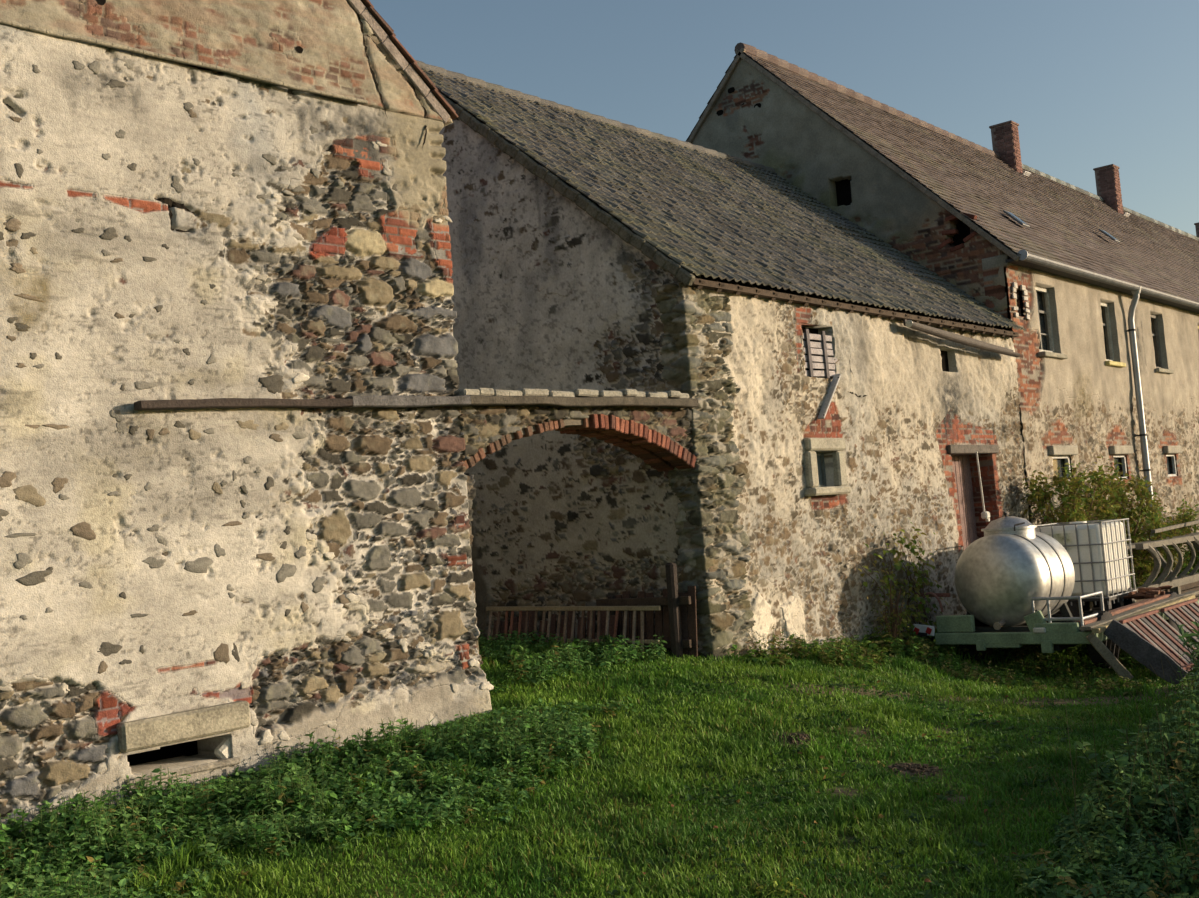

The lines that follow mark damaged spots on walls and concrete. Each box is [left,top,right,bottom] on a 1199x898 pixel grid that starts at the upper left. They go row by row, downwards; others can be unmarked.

crack [358,14,427,145]
flaking render [183,102,197,118]
flaking render [99,227,132,263]
flaking render [901,212,997,299]
flaking render [120,381,158,391]
flaking render [156,118,682,745]
flaking render [70,521,96,541]
flaking render [132,525,168,569]
flaking render [97,642,145,674]
flaking render [0,674,131,817]